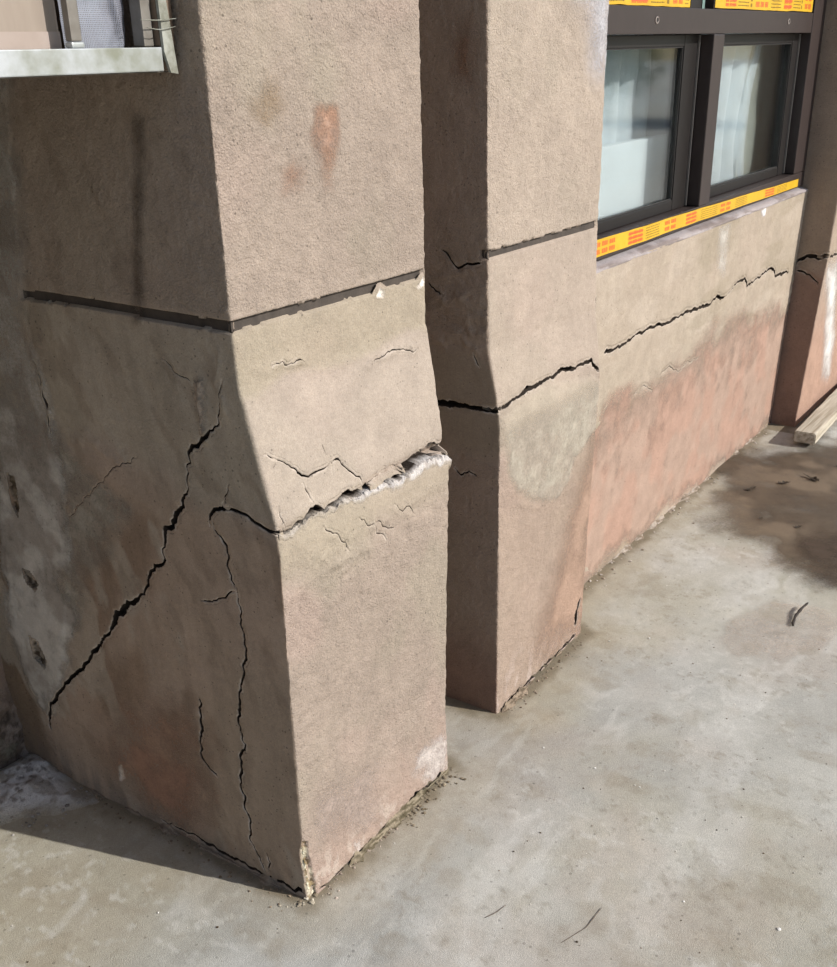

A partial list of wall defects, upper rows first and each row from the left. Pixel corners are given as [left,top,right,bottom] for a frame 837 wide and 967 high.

corrosion [313,106,339,163]
crack [426,247,482,298]
crack [271,355,305,370]
crack [372,345,419,366]
crack [437,251,837,416]
spalling [272,453,452,542]
water stain [540,307,837,645]
crack [47,378,480,895]